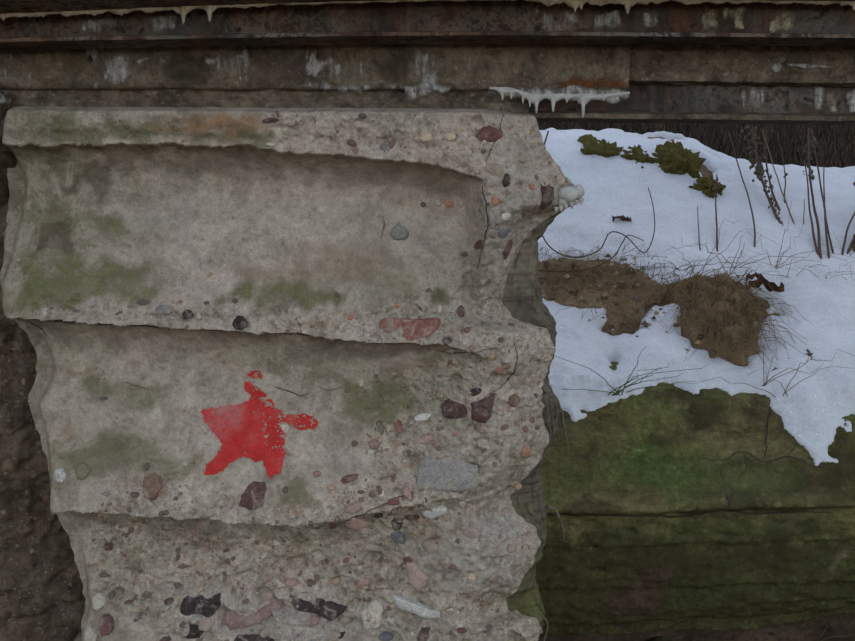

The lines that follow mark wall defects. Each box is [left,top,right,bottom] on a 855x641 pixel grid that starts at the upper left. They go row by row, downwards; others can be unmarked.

leakage [0,0,514,31]
leakage [526,0,855,32]
leakage [405,50,449,98]
rust [560,77,625,92]
leakage [489,86,630,118]